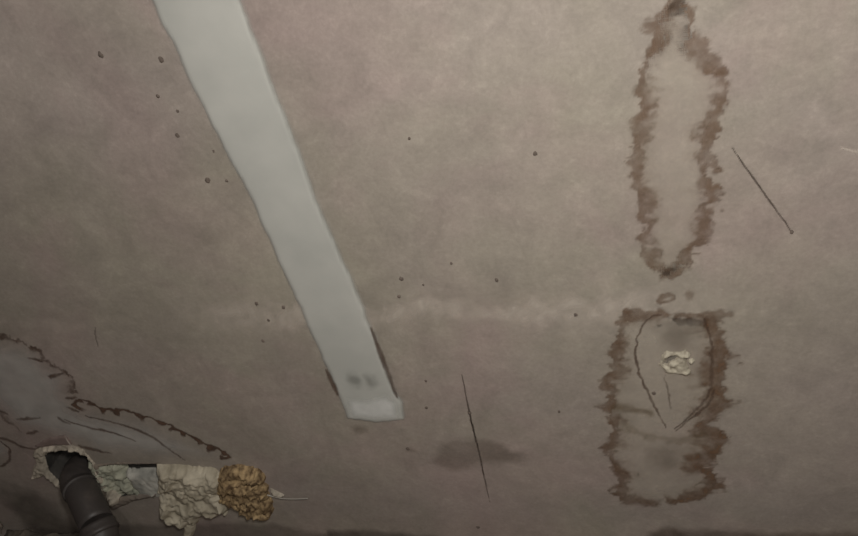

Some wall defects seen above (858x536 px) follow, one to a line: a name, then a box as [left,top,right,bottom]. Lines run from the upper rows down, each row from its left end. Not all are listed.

leakage [647,27,666,57]
leakage [662,175,721,276]
crack [732,148,791,231]
spalling [31,434,161,510]
leakage [29,346,231,460]
crack [462,378,486,484]
leakage [610,308,689,389]
spalling [658,349,695,376]
leakage [667,318,730,504]